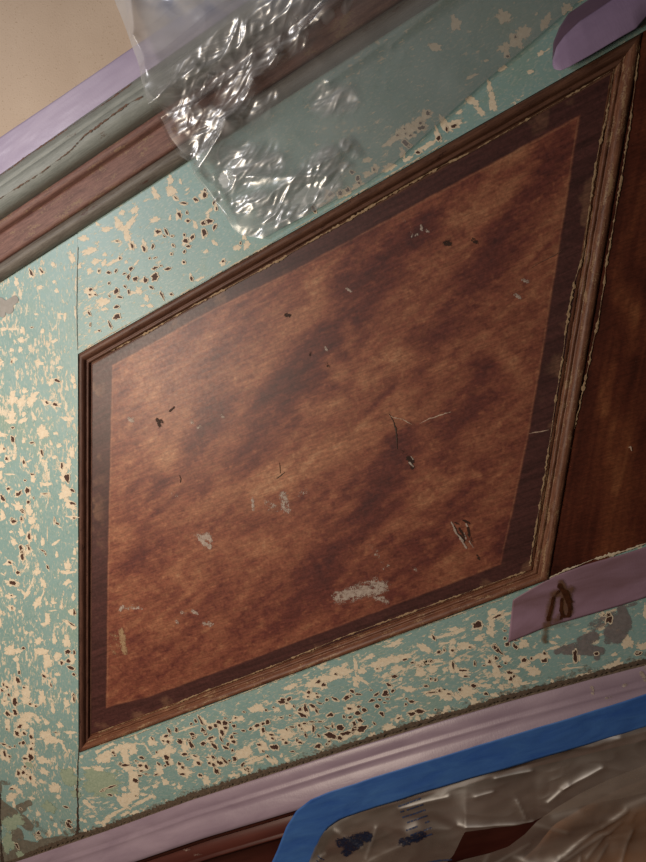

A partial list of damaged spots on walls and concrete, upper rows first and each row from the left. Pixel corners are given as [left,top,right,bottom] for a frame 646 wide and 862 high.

peeling [494,0,583,72]
peeling [28,262,59,293]
peeling [574,45,640,429]
peeling [69,70,614,733]
peeling [0,326,560,857]
peeling [550,543,646,578]
peeling [596,611,646,670]
crack [0,659,646,862]